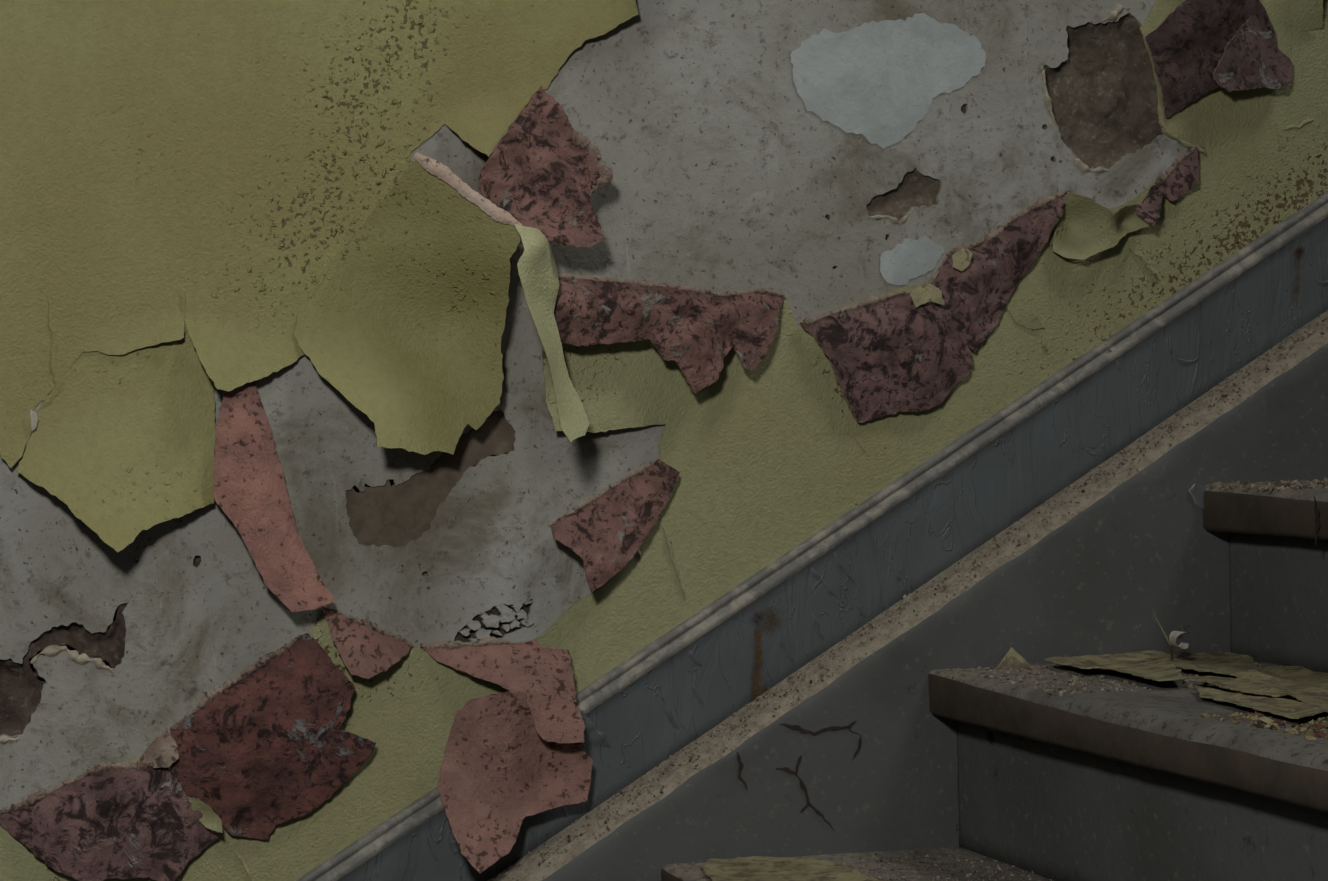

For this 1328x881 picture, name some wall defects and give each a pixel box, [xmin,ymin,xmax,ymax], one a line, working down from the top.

peeling [790,13,986,149]
spalling [1041,0,1323,174]
peeling [293,86,785,547]
peeling [799,146,1199,423]
peeling [0,331,593,881]
peeling [549,458,680,592]
crack [736,752,748,791]
crack [776,720,862,831]